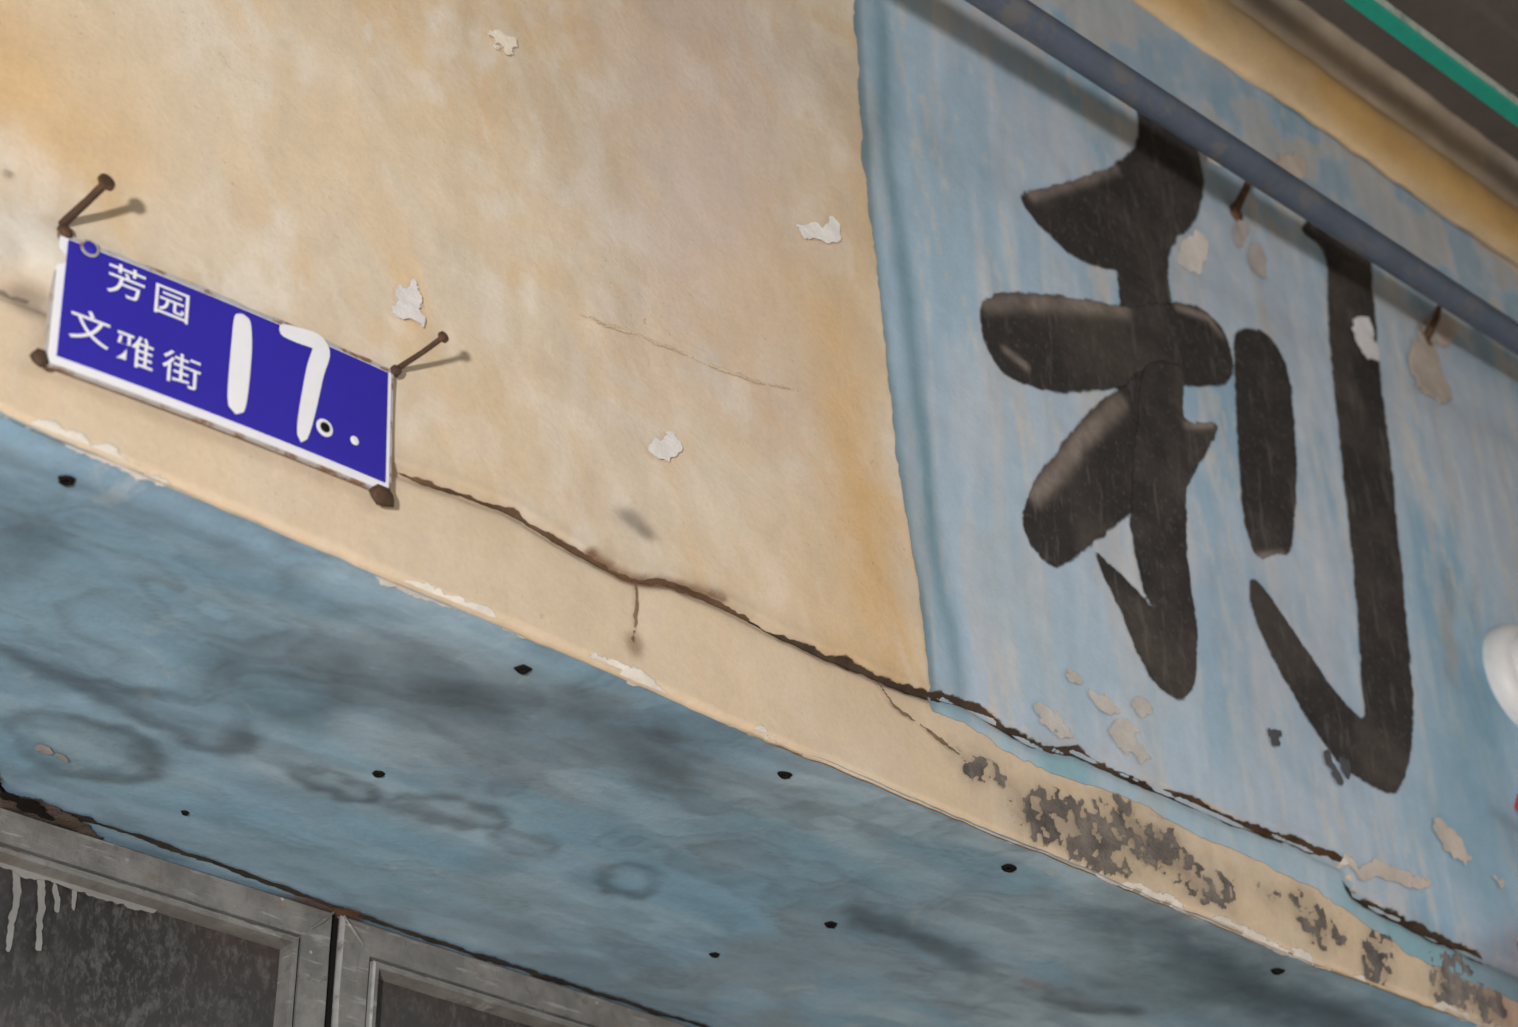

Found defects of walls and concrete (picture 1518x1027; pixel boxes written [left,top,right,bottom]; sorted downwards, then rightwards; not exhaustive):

peeling [796,216,841,244]
crack [0,290,28,304]
peeling [391,278,425,327]
peeling [1408,311,1459,404]
peeling [648,430,683,462]
crack [398,473,1488,966]
peeling [1267,728,1282,746]
spalling [0,778,101,839]
peeling [1433,817,1472,866]
peeling [957,748,1408,997]
leakage [0,862,157,952]
peeling [1429,951,1507,1027]